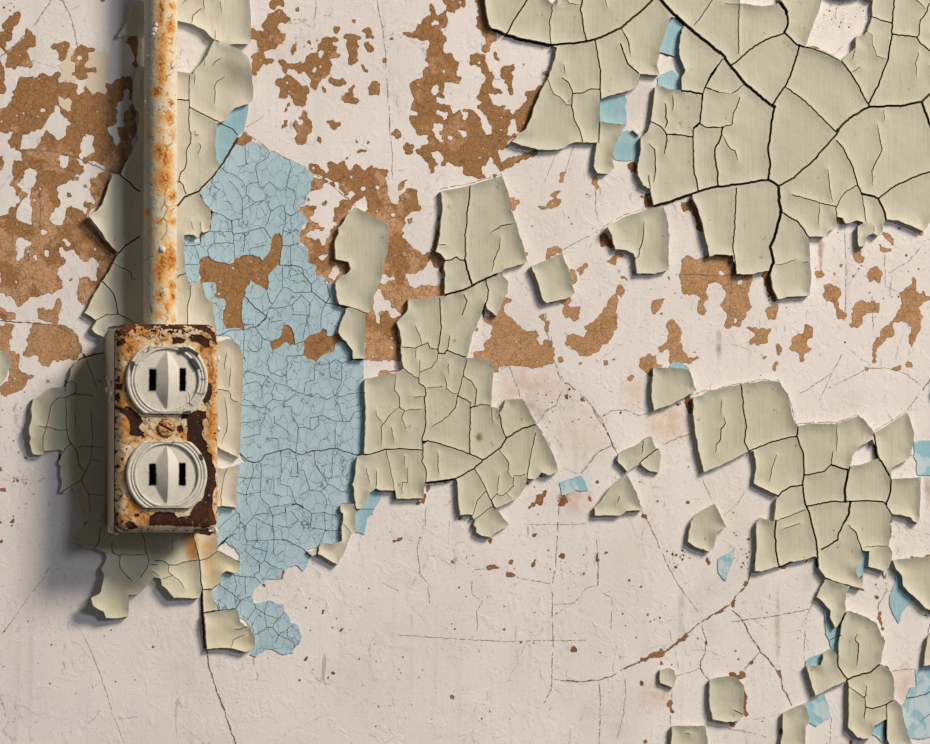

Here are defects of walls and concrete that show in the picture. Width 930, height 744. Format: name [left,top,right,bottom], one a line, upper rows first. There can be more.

crack [377,0,393,177]
peeling [0,1,144,337]
crack [15,113,140,192]
crack [491,0,930,313]
crack [0,320,104,360]
peeling [531,246,589,321]
peeling [565,270,628,365]
peeling [823,283,884,328]
peeling [865,268,930,371]
crack [43,379,104,496]
crack [97,59,691,744]
peeling [639,298,930,744]